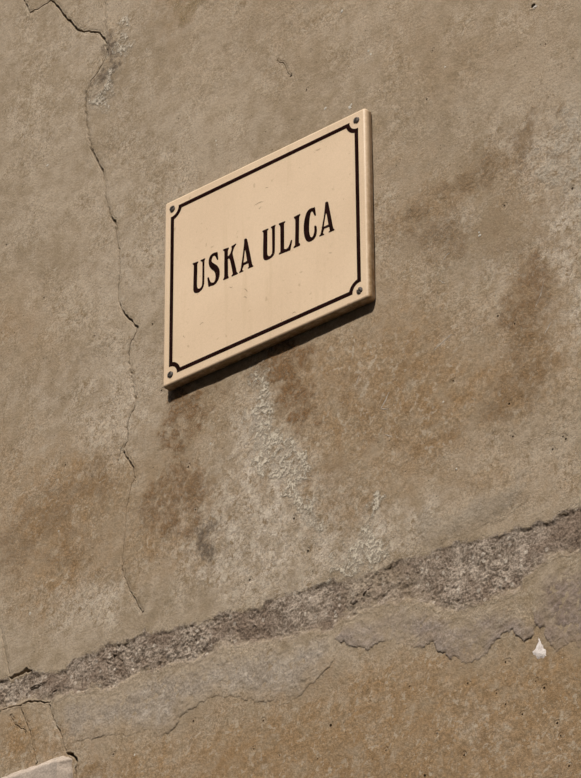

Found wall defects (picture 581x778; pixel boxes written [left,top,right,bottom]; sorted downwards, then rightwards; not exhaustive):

crack [21,0,144,614]
crack [0,619,32,683]
crack [1,698,80,778]
flaking render [0,501,581,747]